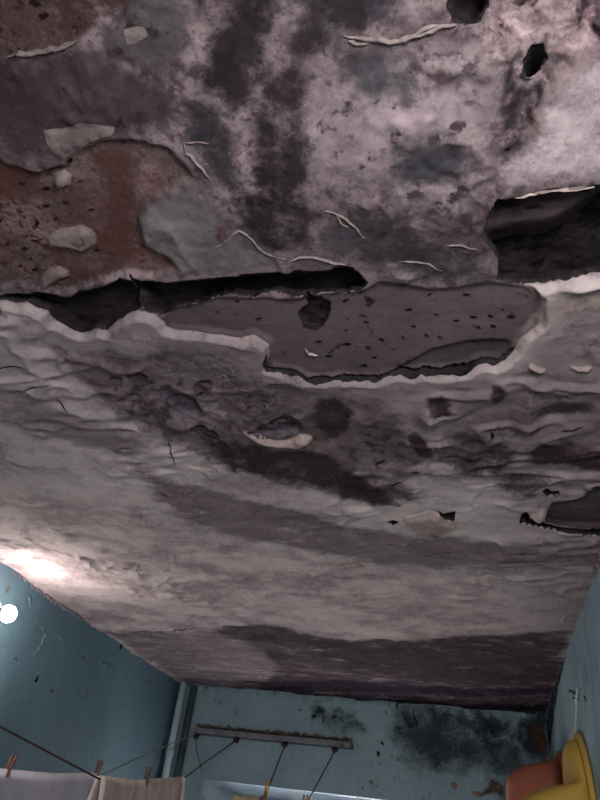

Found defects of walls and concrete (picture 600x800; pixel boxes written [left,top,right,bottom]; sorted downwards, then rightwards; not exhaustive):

flaking render [0,0,133,58]
leakage [0,0,188,153]
flaking render [123,26,147,45]
leakage [138,0,491,280]
flaking render [446,0,600,122]
leakage [500,79,547,162]
flaking render [165,185,600,378]
flaking render [244,431,313,449]
leakage [56,346,557,506]
leakage [530,441,600,470]
flaking render [530,486,600,529]
leakage [107,625,572,775]